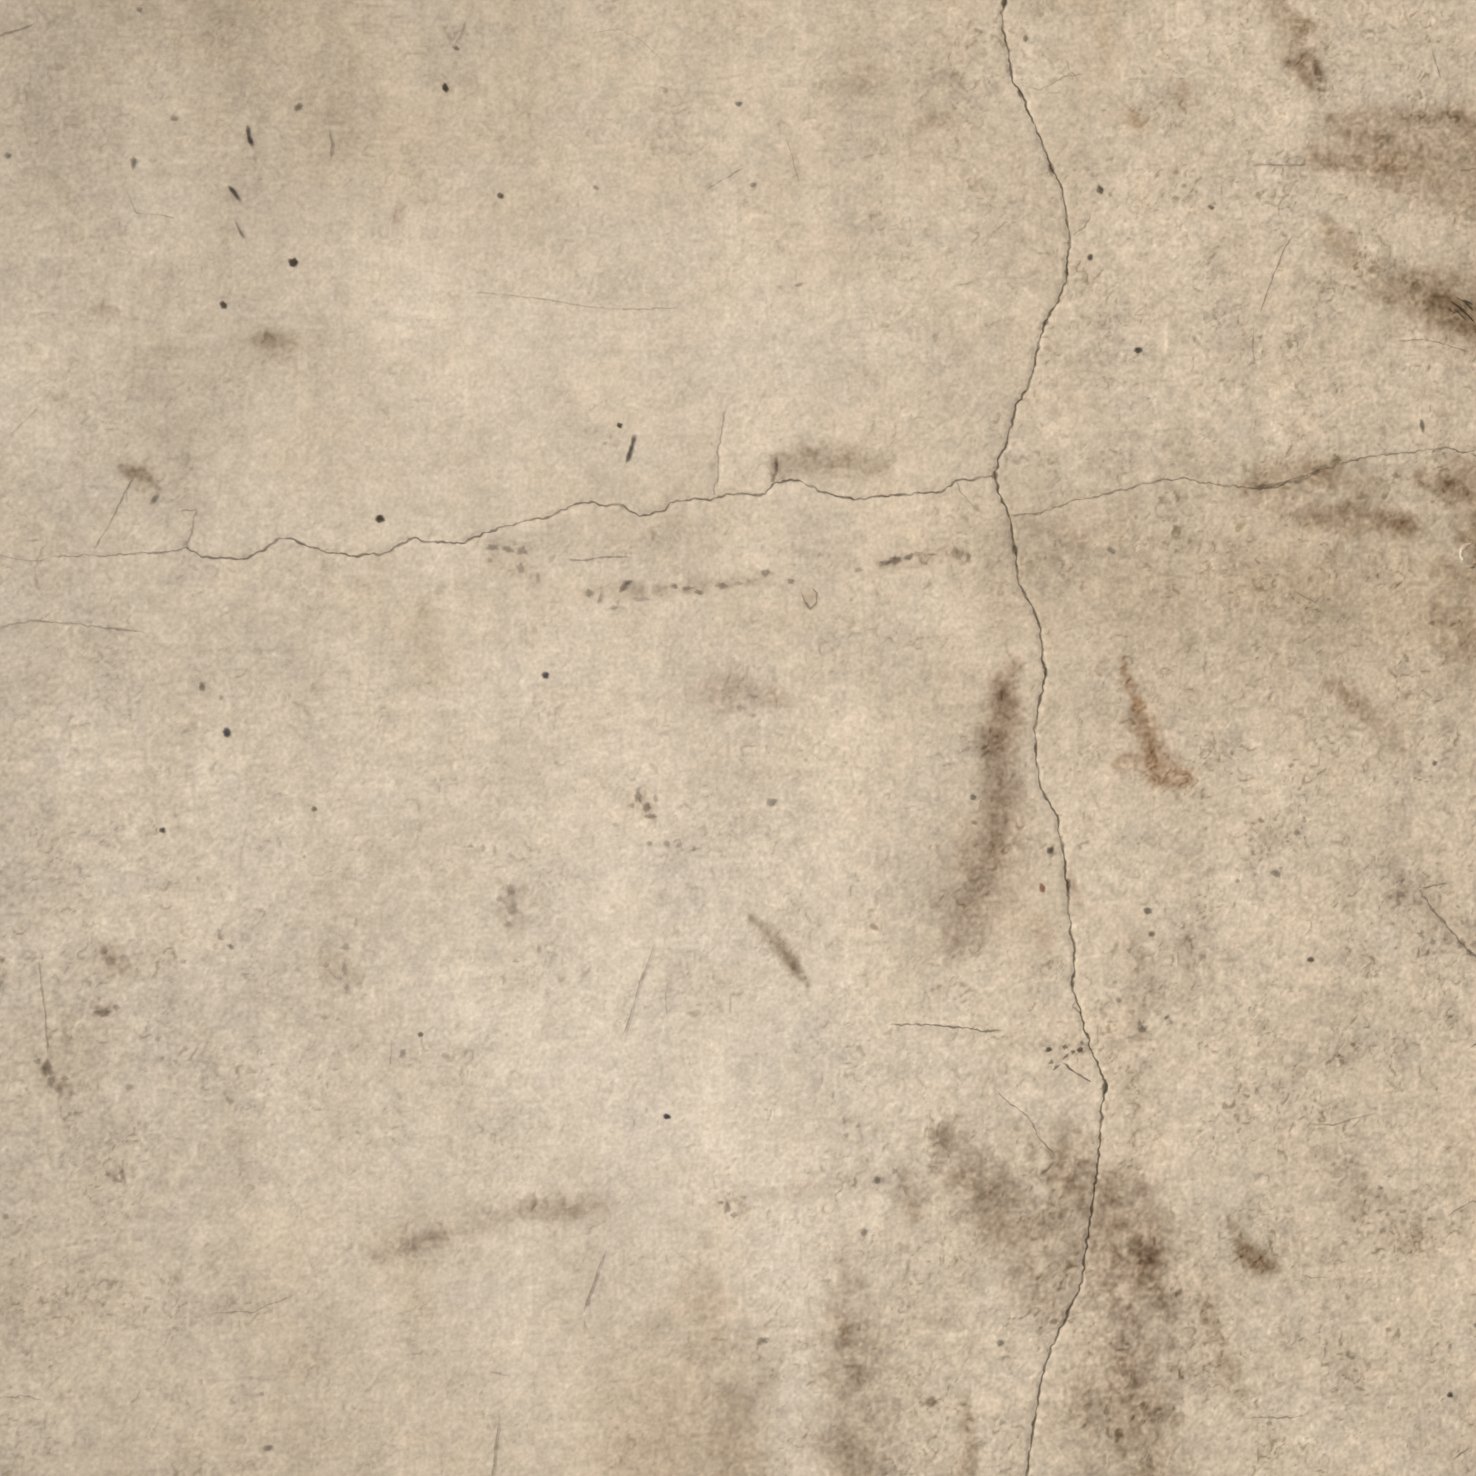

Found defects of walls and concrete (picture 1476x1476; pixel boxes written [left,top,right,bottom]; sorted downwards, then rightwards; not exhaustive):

crack [534,502,668,519]
crack [761,0,1108,1475]